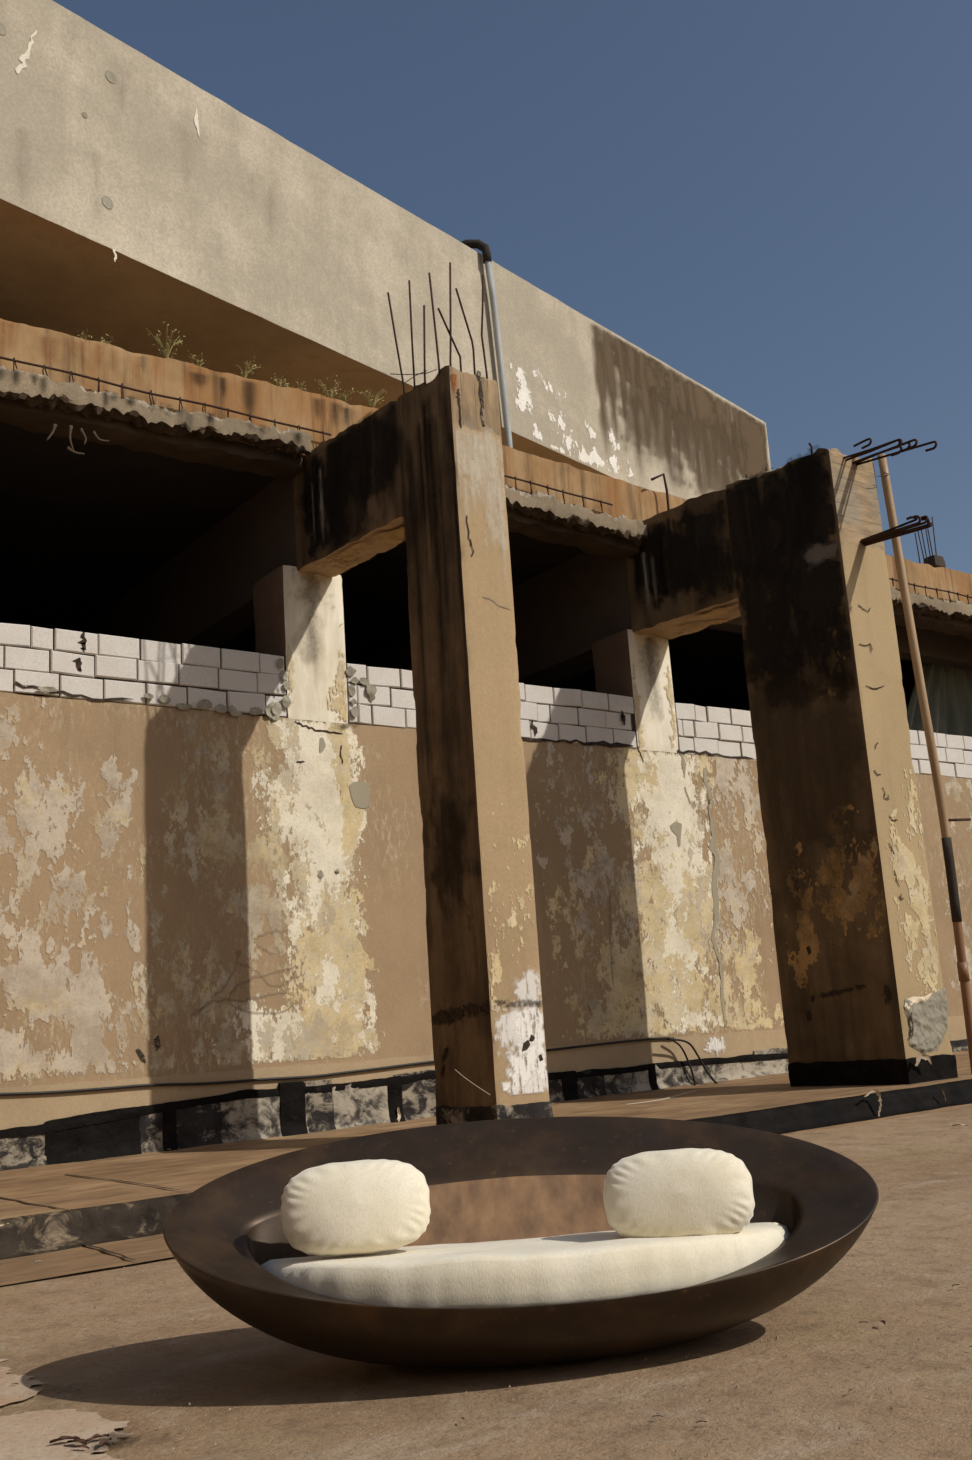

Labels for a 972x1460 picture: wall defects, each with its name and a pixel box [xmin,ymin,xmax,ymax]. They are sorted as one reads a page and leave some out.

spalling [0,356,331,441]
damp [302,405,439,635]
spalling [387,262,488,427]
damp [451,432,503,631]
peeling [510,363,633,478]
damp [593,326,854,704]
peeling [0,644,385,1081]
peeling [482,664,972,1061]